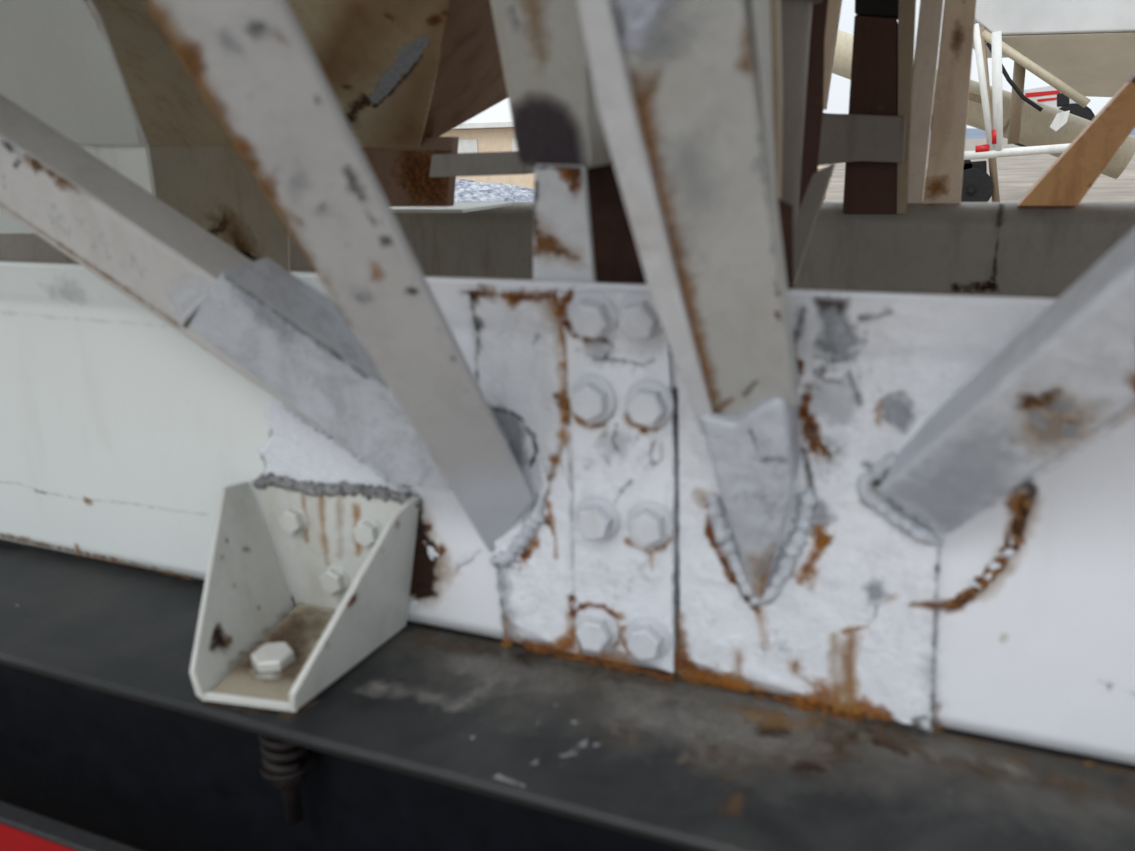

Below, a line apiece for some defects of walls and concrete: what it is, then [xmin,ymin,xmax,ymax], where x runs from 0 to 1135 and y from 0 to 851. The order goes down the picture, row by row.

peeling [370,11,448,108]
corrosion [391,150,451,205]
corrosion [533,166,582,258]
corrosion [462,284,606,344]
peeling [258,396,411,491]
corrosion [544,386,598,530]
corrosion [796,355,831,490]
corrosion [409,495,445,600]
corrosion [518,537,539,562]
corrosion [797,502,831,584]
corrosion [517,595,760,697]
corrosion [776,627,894,727]